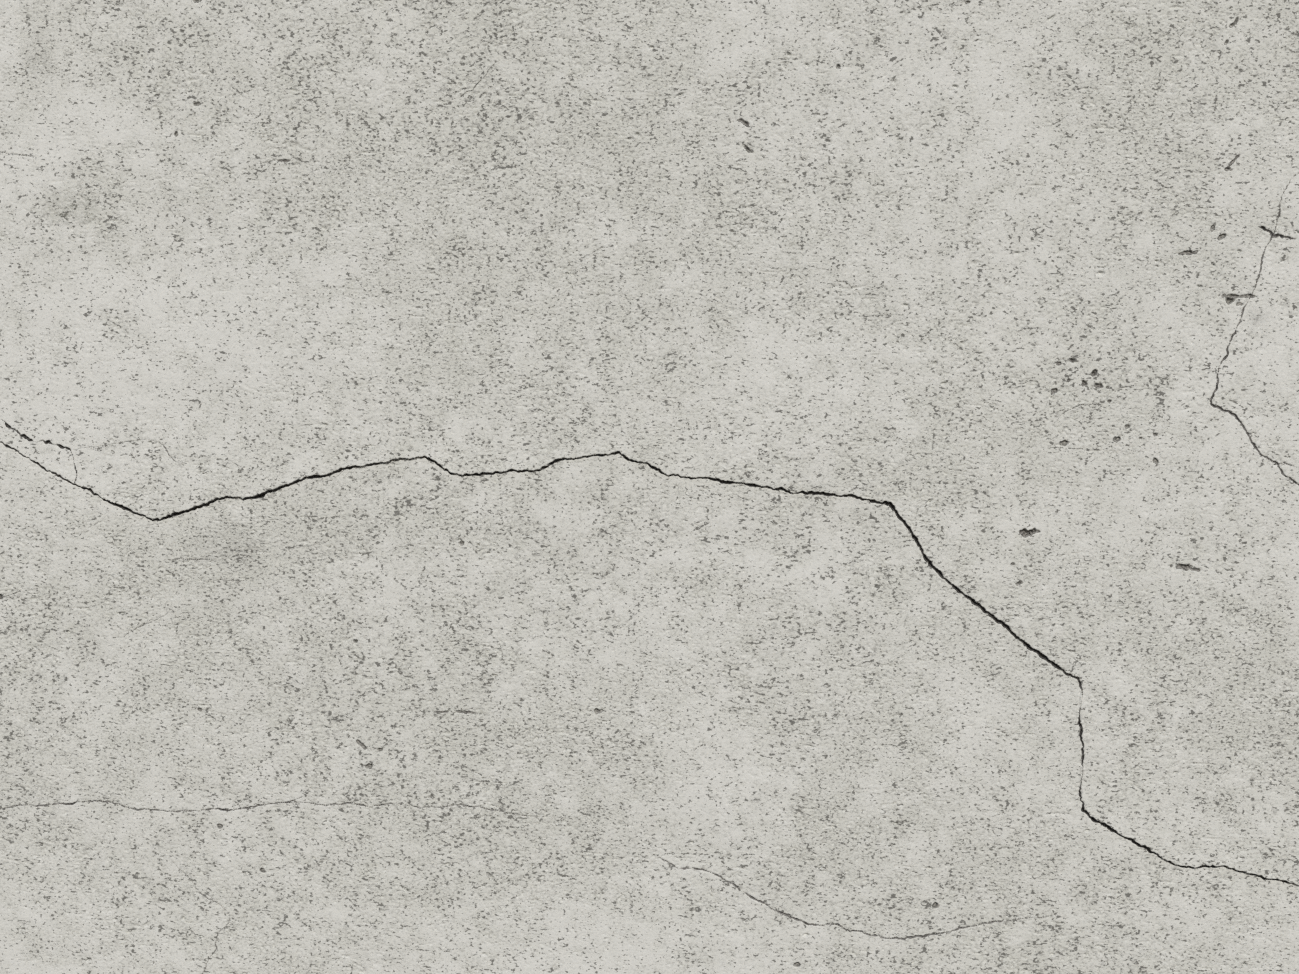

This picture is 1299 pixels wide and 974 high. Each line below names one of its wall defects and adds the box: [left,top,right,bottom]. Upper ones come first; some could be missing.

crack [1210,173,1299,485]
crack [0,420,1299,886]
crack [659,857,1053,940]